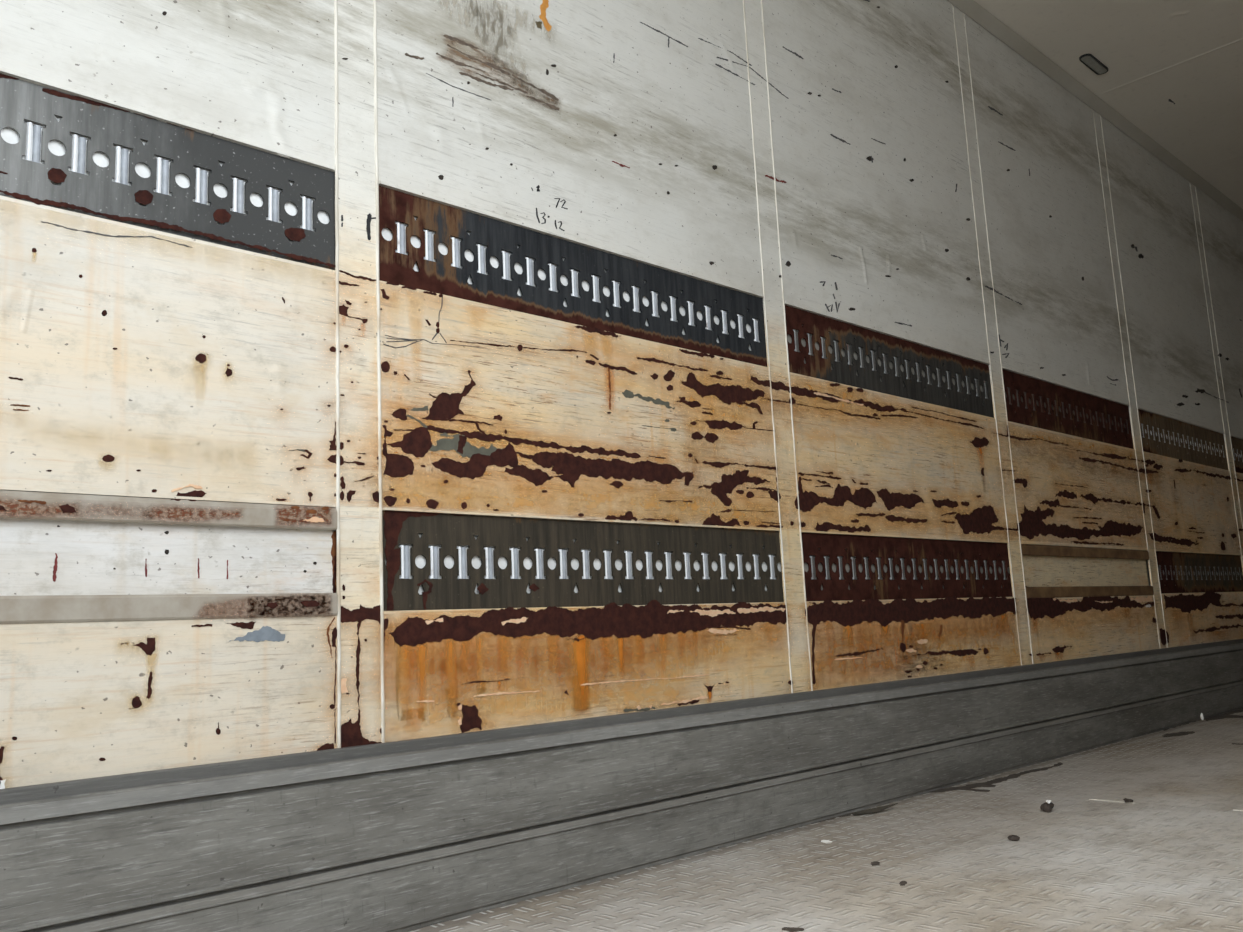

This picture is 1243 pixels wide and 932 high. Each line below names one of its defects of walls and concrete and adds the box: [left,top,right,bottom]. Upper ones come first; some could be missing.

corrosion [536,0,552,32]
corrosion [42,88,195,131]
corrosion [48,168,67,183]
corrosion [0,190,443,330]
corrosion [575,325,618,338]
peeling [622,389,677,432]
corrosion [0,500,126,516]
corrosion [144,484,240,521]
corrosion [201,349,1243,751]